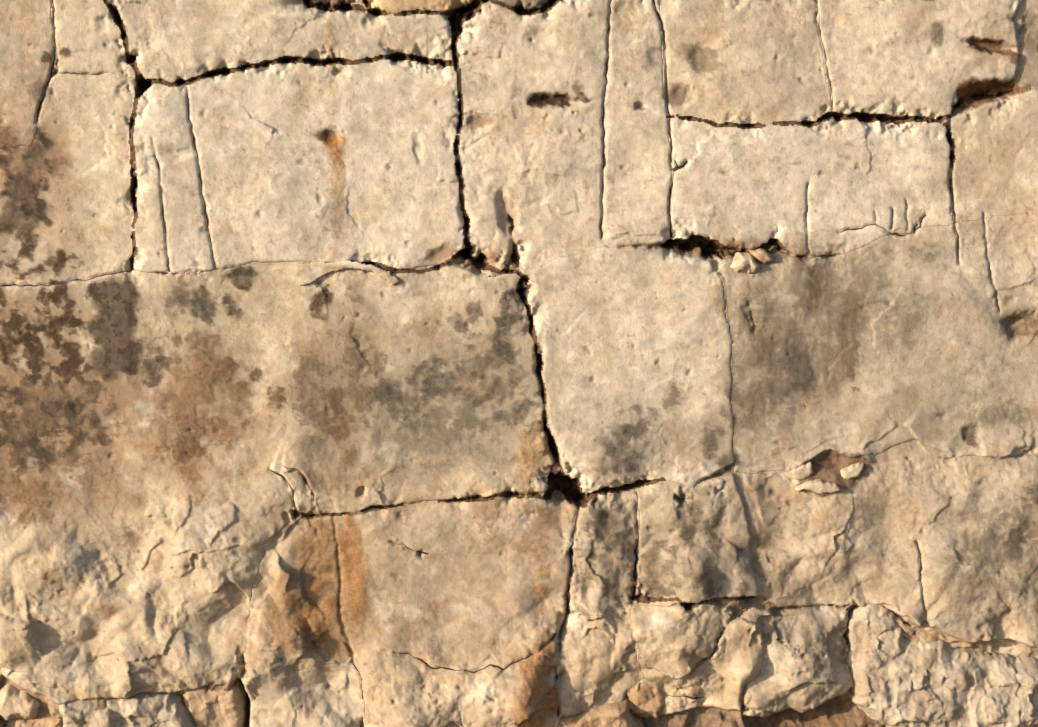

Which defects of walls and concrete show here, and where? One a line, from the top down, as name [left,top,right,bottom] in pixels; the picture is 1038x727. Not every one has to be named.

leakage [41,48,70,62]
leakage [528,86,589,108]
crack [600,0,611,238]
crack [653,0,687,240]
crack [815,0,833,111]
crack [186,87,217,270]
corrosion [315,130,345,231]
crack [842,200,926,237]
crack [950,179,959,262]
leakage [0,126,537,523]
spalling [789,449,872,496]
crack [398,498,579,673]